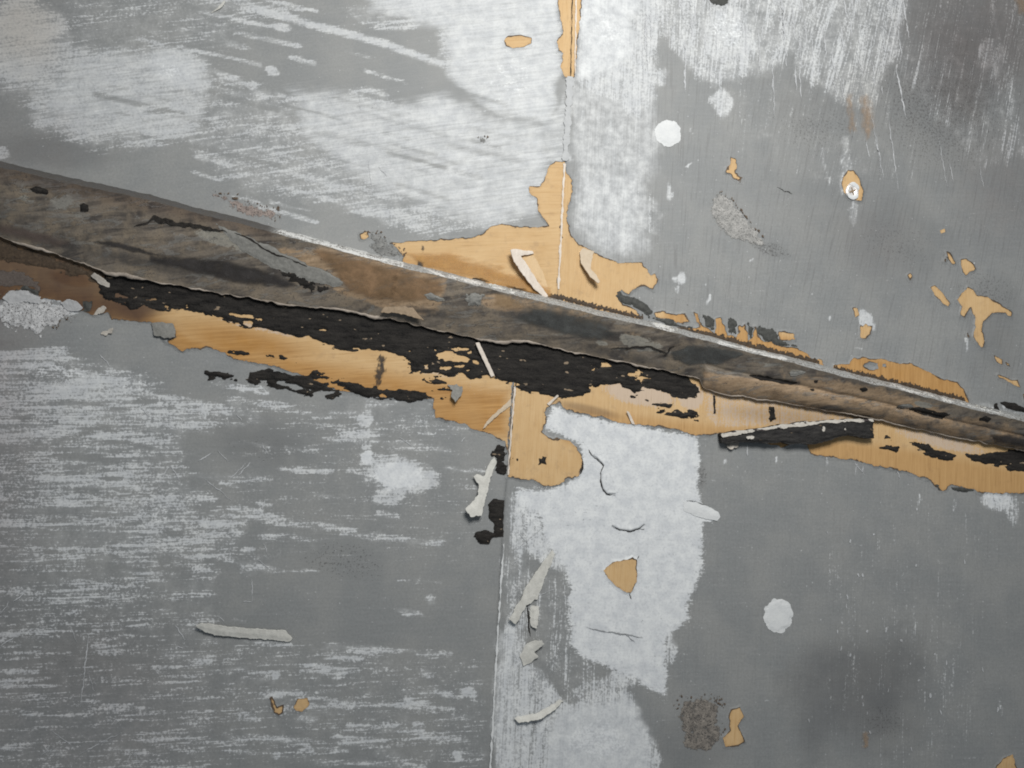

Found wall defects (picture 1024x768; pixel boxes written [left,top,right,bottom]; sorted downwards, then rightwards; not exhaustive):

peeling [216,223,345,287]
peeling [389,159,971,403]
peeling [0,237,1024,496]
crack [580,448,645,532]
peeling [683,501,720,521]
peeling [601,555,640,597]
peeling [520,605,544,666]
peeling [267,693,313,718]
peeling [720,704,748,749]